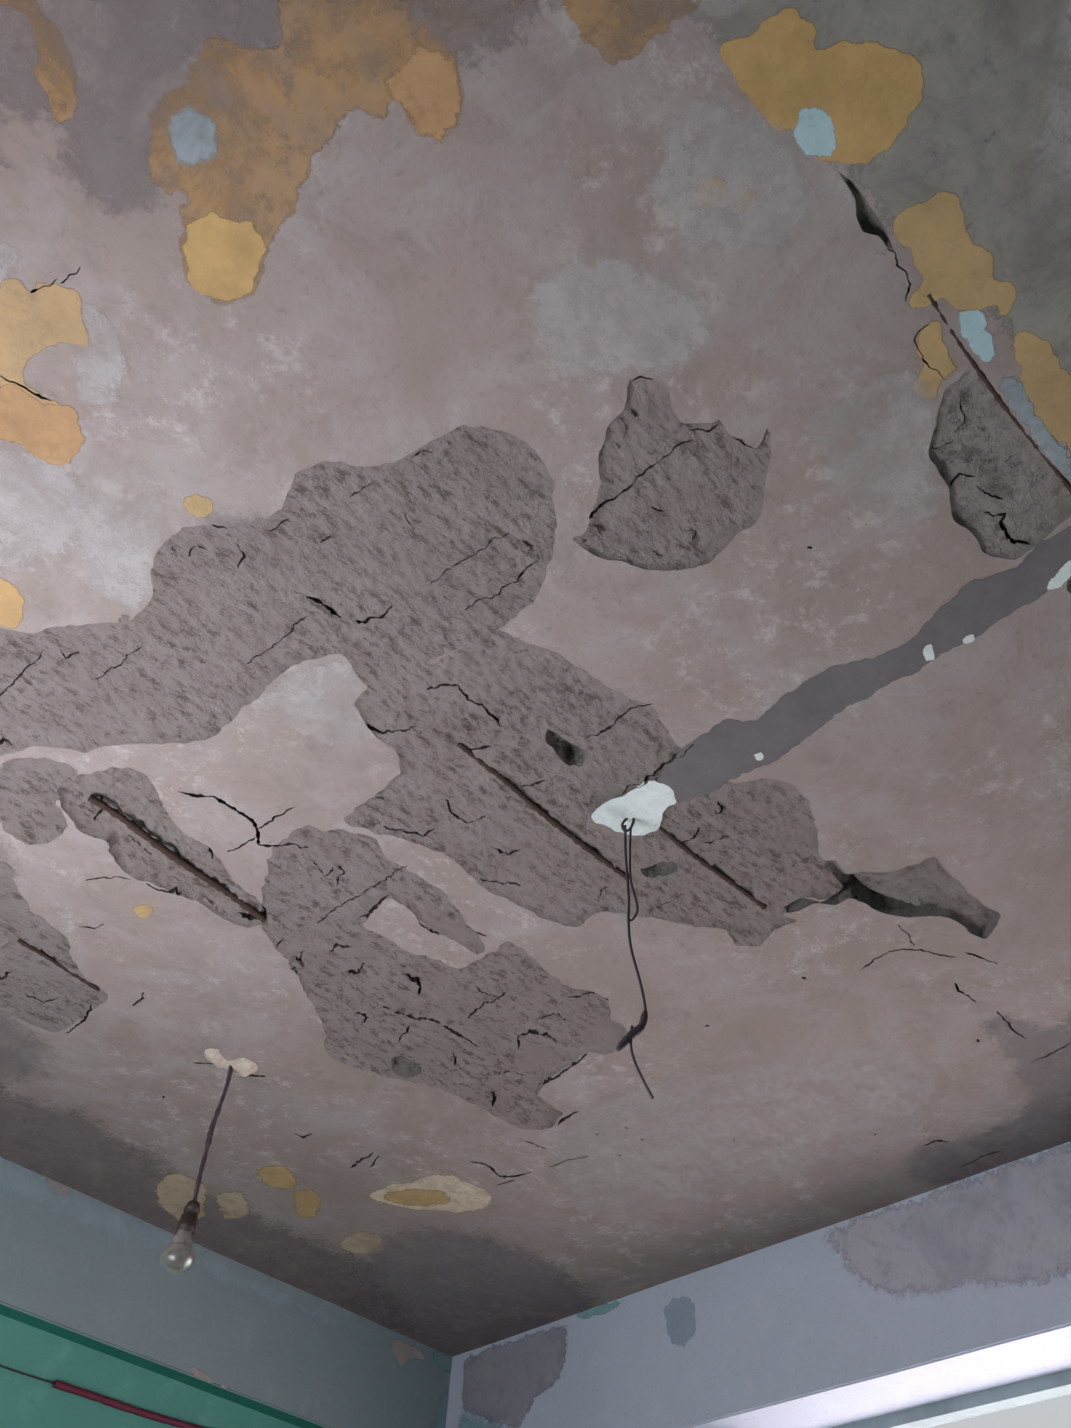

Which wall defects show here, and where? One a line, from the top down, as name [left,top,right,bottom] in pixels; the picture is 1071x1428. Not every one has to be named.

leakage [0,0,281,212]
leakage [652,100,809,250]
peeling [0,278,89,465]
leakage [531,253,711,376]
crack [178,791,308,852]
spalling [0,424,1001,1130]
flaking render [433,1301,620,1428]